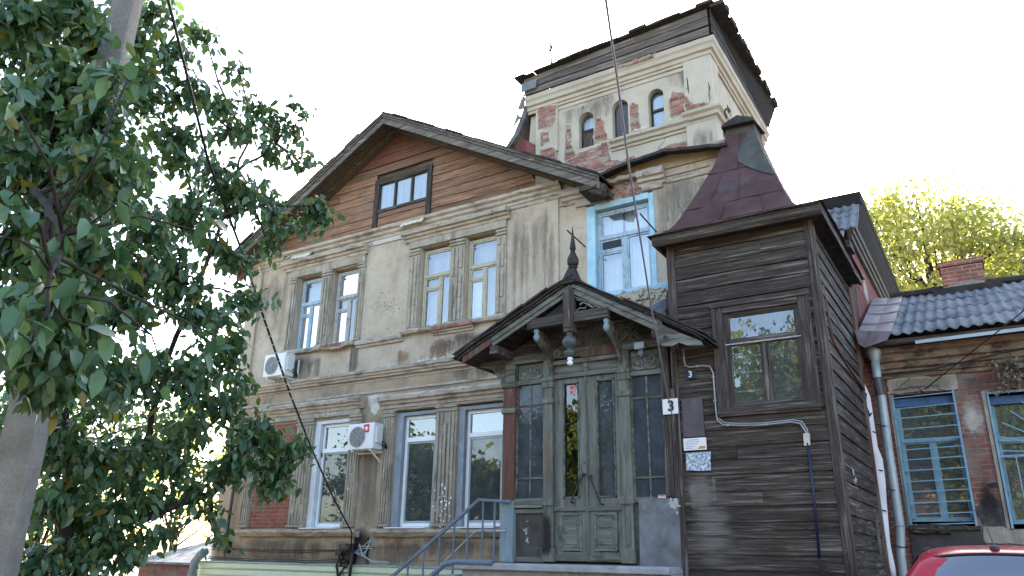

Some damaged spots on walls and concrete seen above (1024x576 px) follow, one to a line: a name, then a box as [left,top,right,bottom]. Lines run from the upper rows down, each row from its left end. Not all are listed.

flaking render [537,91,710,172]
flaking render [605,181,642,204]